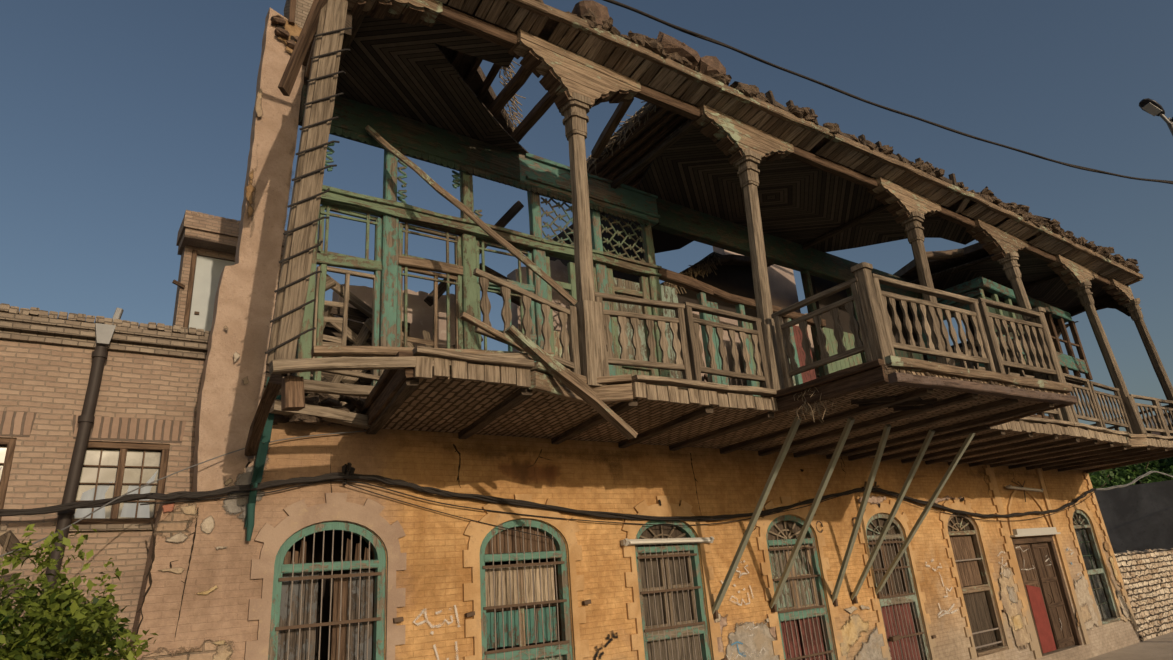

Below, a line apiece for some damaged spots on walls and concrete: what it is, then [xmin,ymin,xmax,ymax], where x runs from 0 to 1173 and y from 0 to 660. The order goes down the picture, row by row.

flaking render [276,19,302,54]
flaking render [153,501,215,543]
crack [134,507,199,650]
flaking render [139,640,233,660]